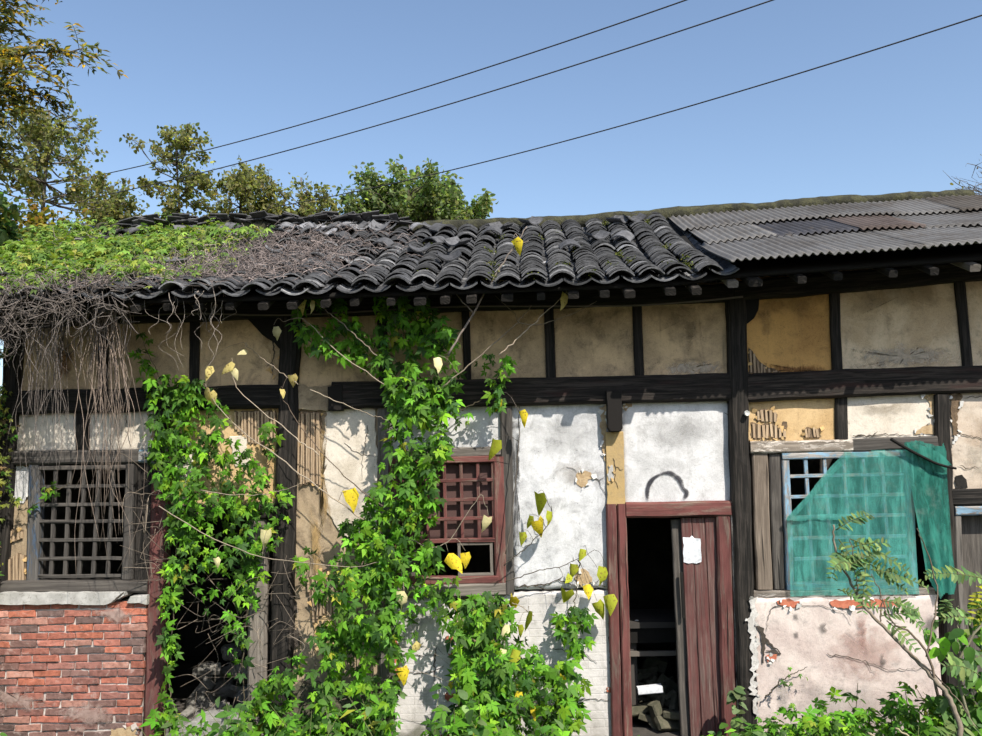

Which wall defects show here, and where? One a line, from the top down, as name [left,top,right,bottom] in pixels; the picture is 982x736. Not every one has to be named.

flaking render [749,405,788,441]
flaking render [575,404,615,489]
spalling [777,598,803,611]
spalling [830,597,899,612]
crack [827,653,918,672]